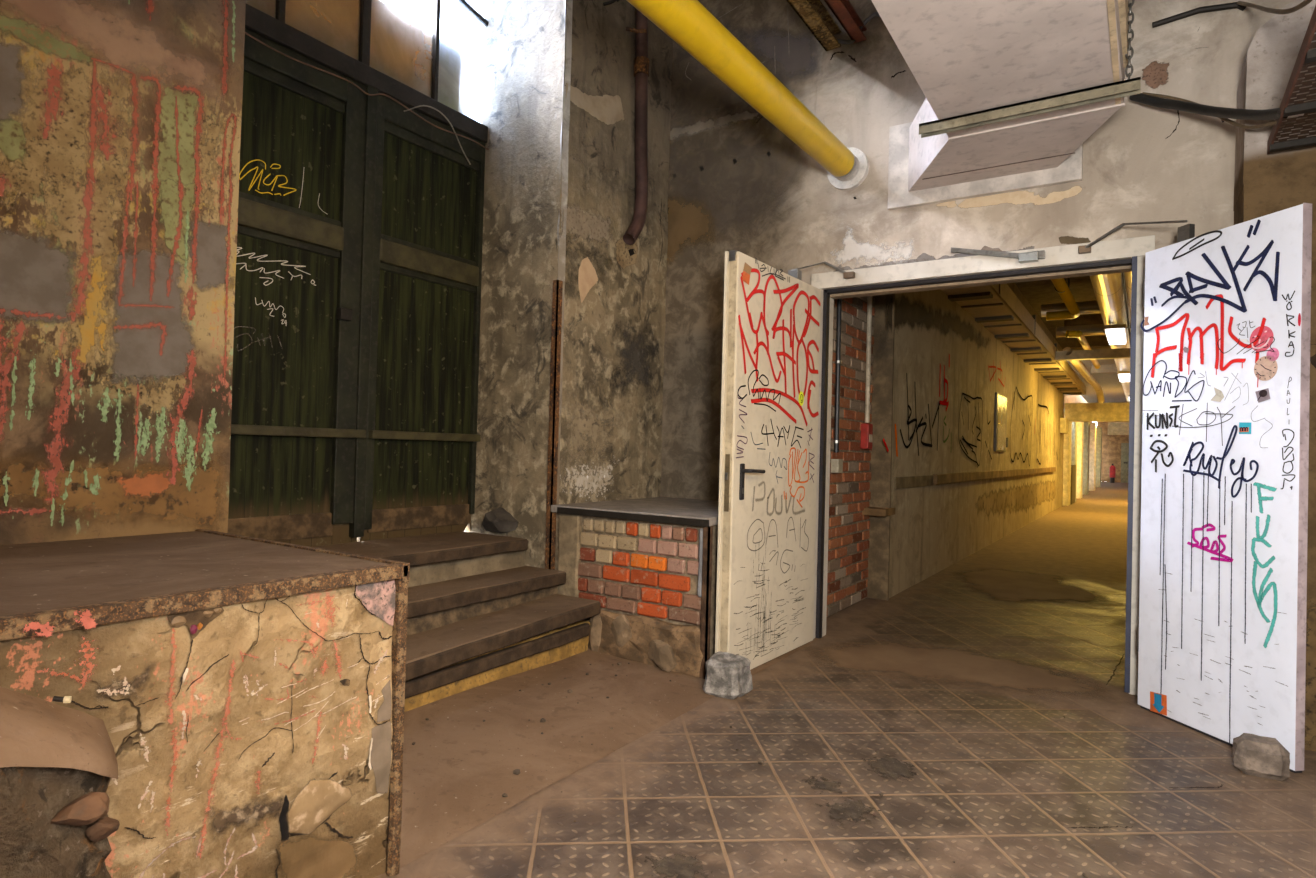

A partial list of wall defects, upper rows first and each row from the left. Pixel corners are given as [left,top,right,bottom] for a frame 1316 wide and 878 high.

flaking render [833,246,1034,272]
crack [71,585,392,767]
crack [125,827,156,839]
crack [275,815,353,878]